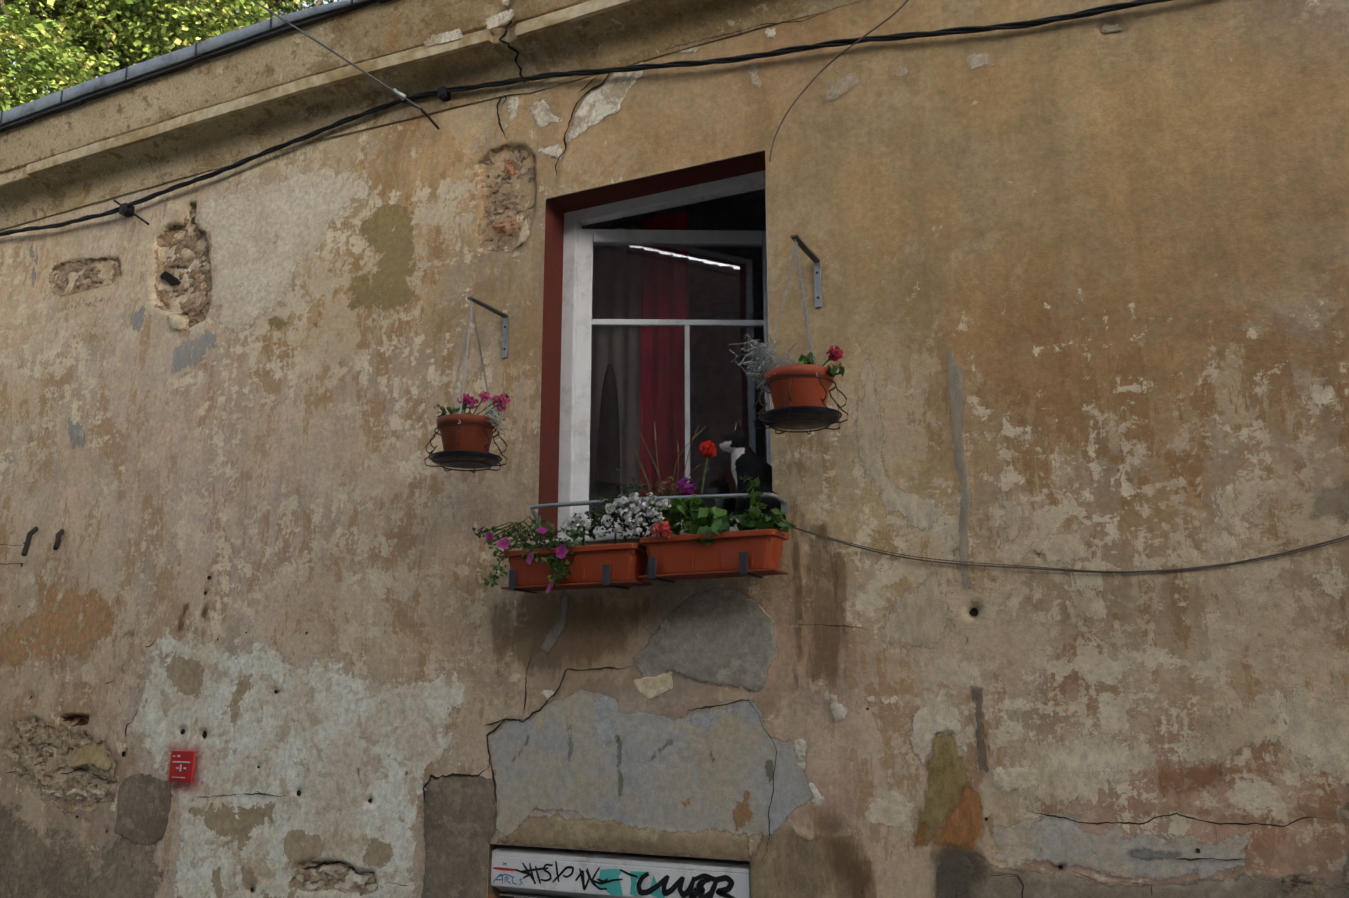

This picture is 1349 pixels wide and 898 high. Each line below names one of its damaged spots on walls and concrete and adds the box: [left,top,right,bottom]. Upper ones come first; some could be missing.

crack [496,18,526,138]
flaking render [477,62,643,253]
flaking render [29,247,122,308]
peeling [131,166,372,372]
peeling [68,417,85,450]
flaking render [1,715,118,816]
peeling [131,626,466,898]
peeling [488,671,824,837]
peeling [823,690,848,721]
crack [990,872,1024,898]
crack [1031,811,1343,827]
crack [1176,855,1248,863]